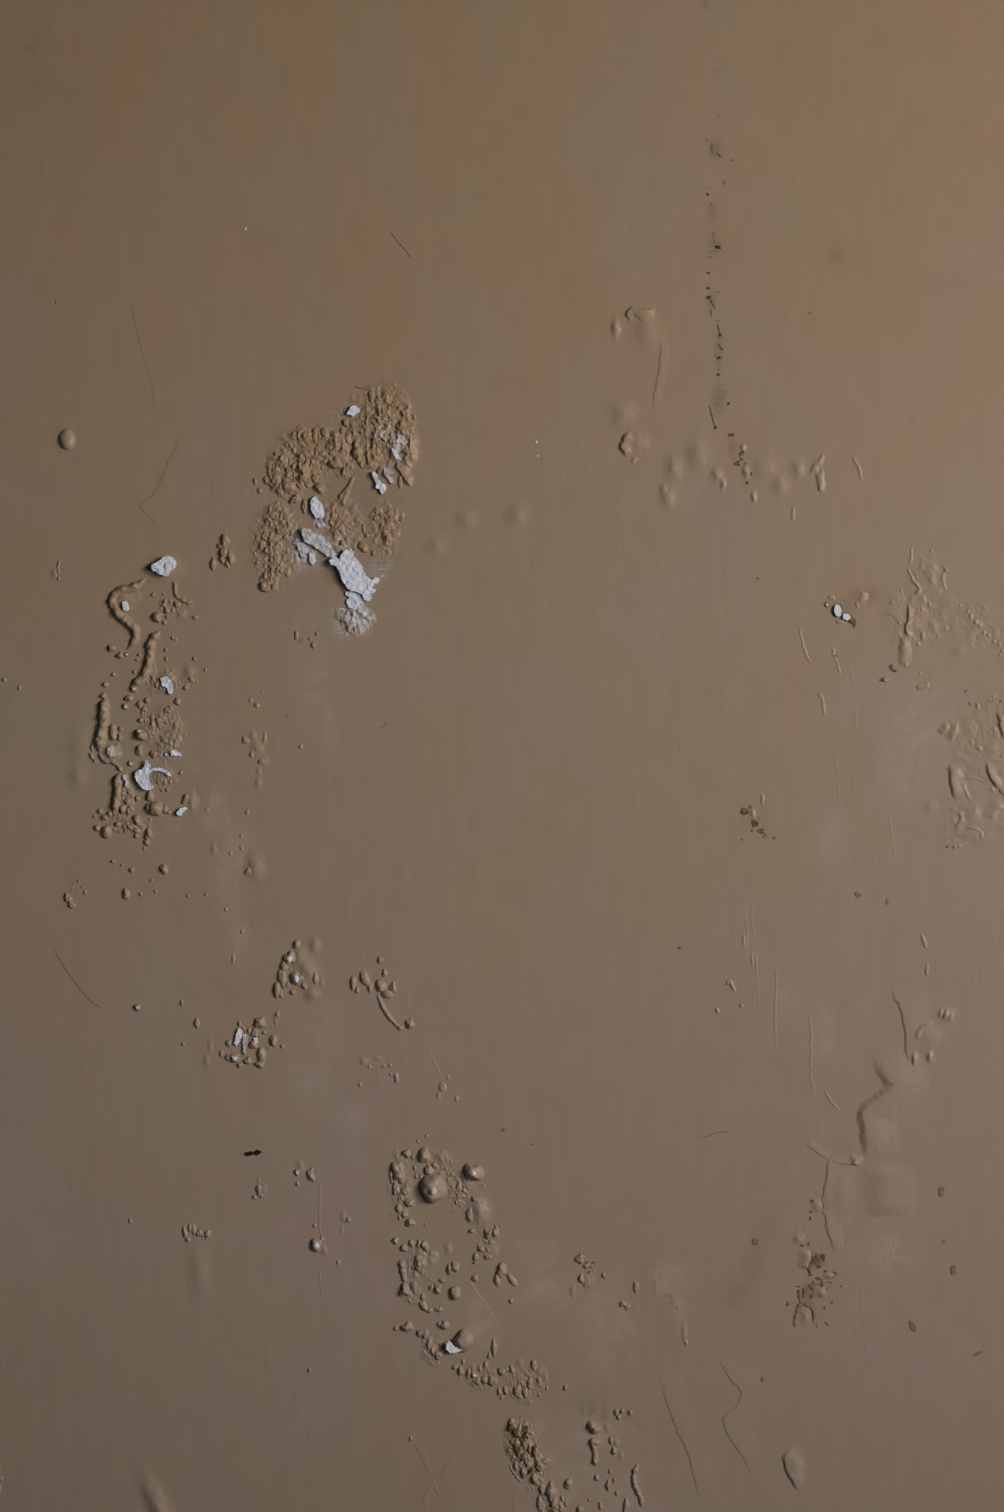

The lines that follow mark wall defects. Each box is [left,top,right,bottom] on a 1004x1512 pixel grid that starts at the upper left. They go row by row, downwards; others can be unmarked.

peeling [246,379,427,637]